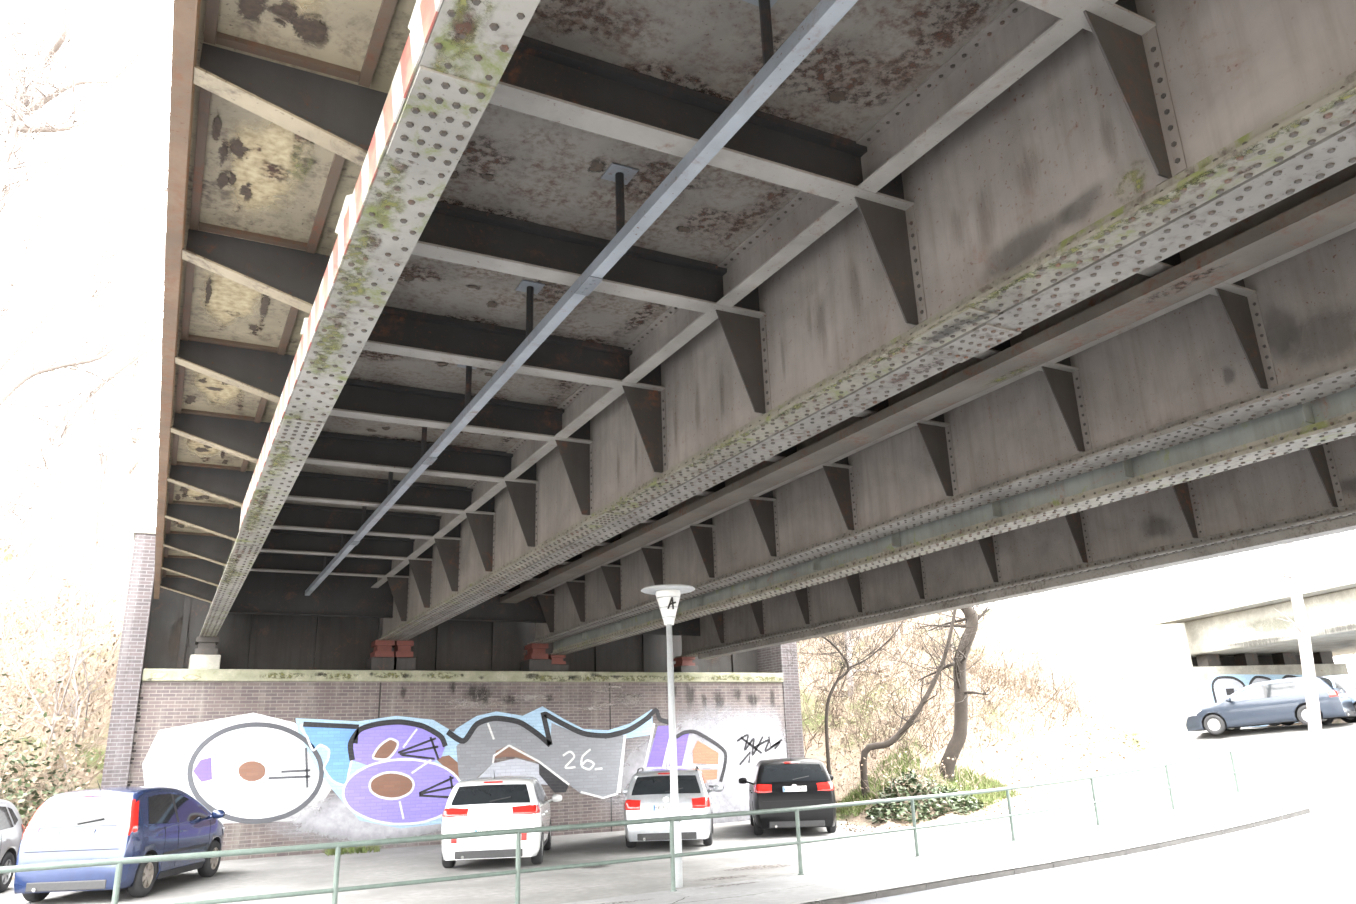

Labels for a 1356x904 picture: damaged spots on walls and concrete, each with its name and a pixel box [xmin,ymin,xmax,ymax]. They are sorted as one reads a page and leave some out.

rust [535,0,638,40]
rust [780,0,983,106]
rust [625,64,733,102]
rust [450,136,513,182]
rust [588,160,606,172]
rust [625,162,675,200]
rust [676,186,788,242]